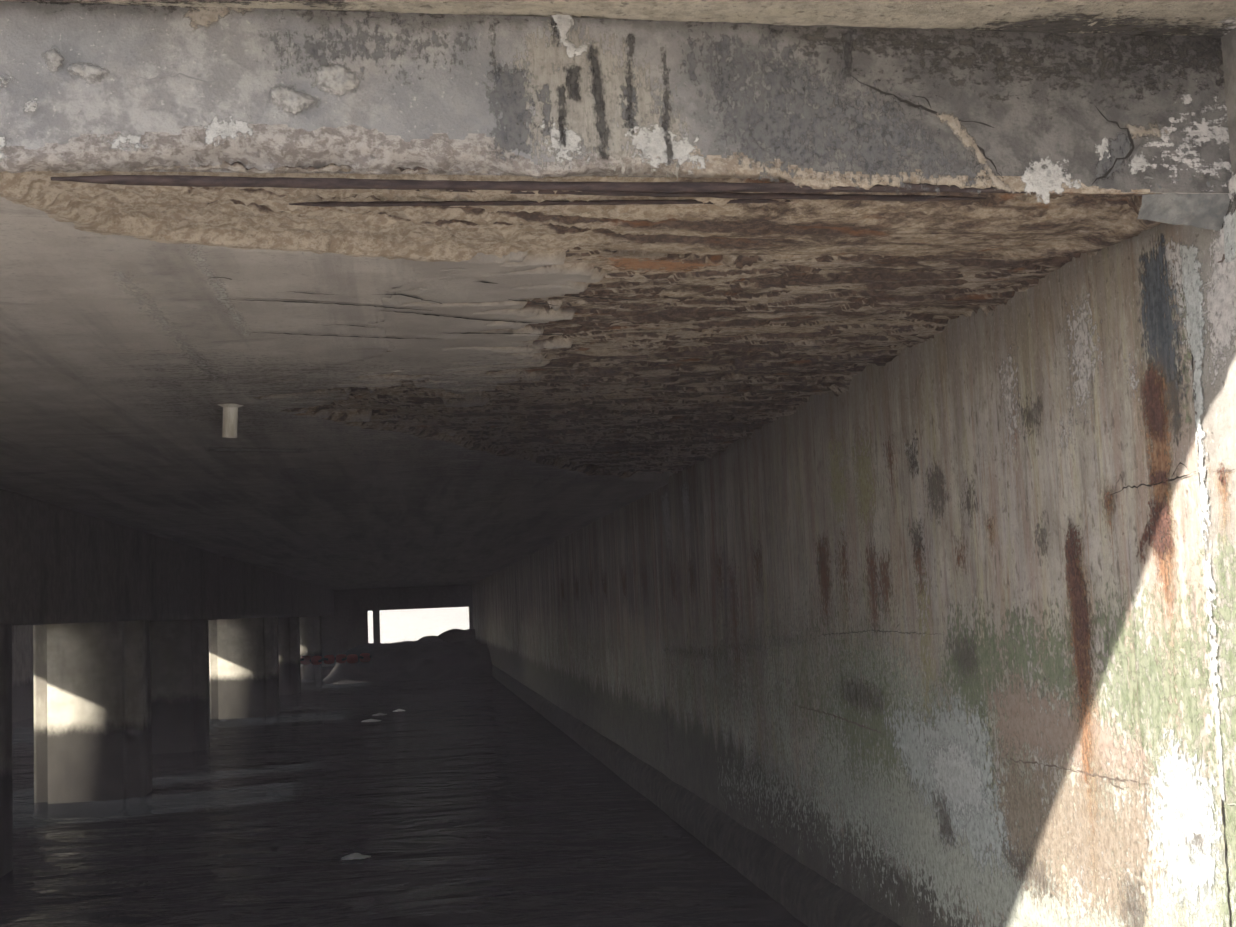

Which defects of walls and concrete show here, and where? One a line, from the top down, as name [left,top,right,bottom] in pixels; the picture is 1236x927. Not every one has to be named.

water stain [128,0,1232,195]
crack [848,74,1015,193]
water stain [1021,156,1081,204]
crack [1092,106,1168,185]
spalling [0,115,1162,479]
corrosion [814,528,893,633]
corrosion [1063,521,1095,832]
crack [1003,316,1235,889]
corrosion [1136,362,1175,619]
water stain [1124,233,1225,801]
water stain [931,791,956,852]
crack [1221,798,1236,927]